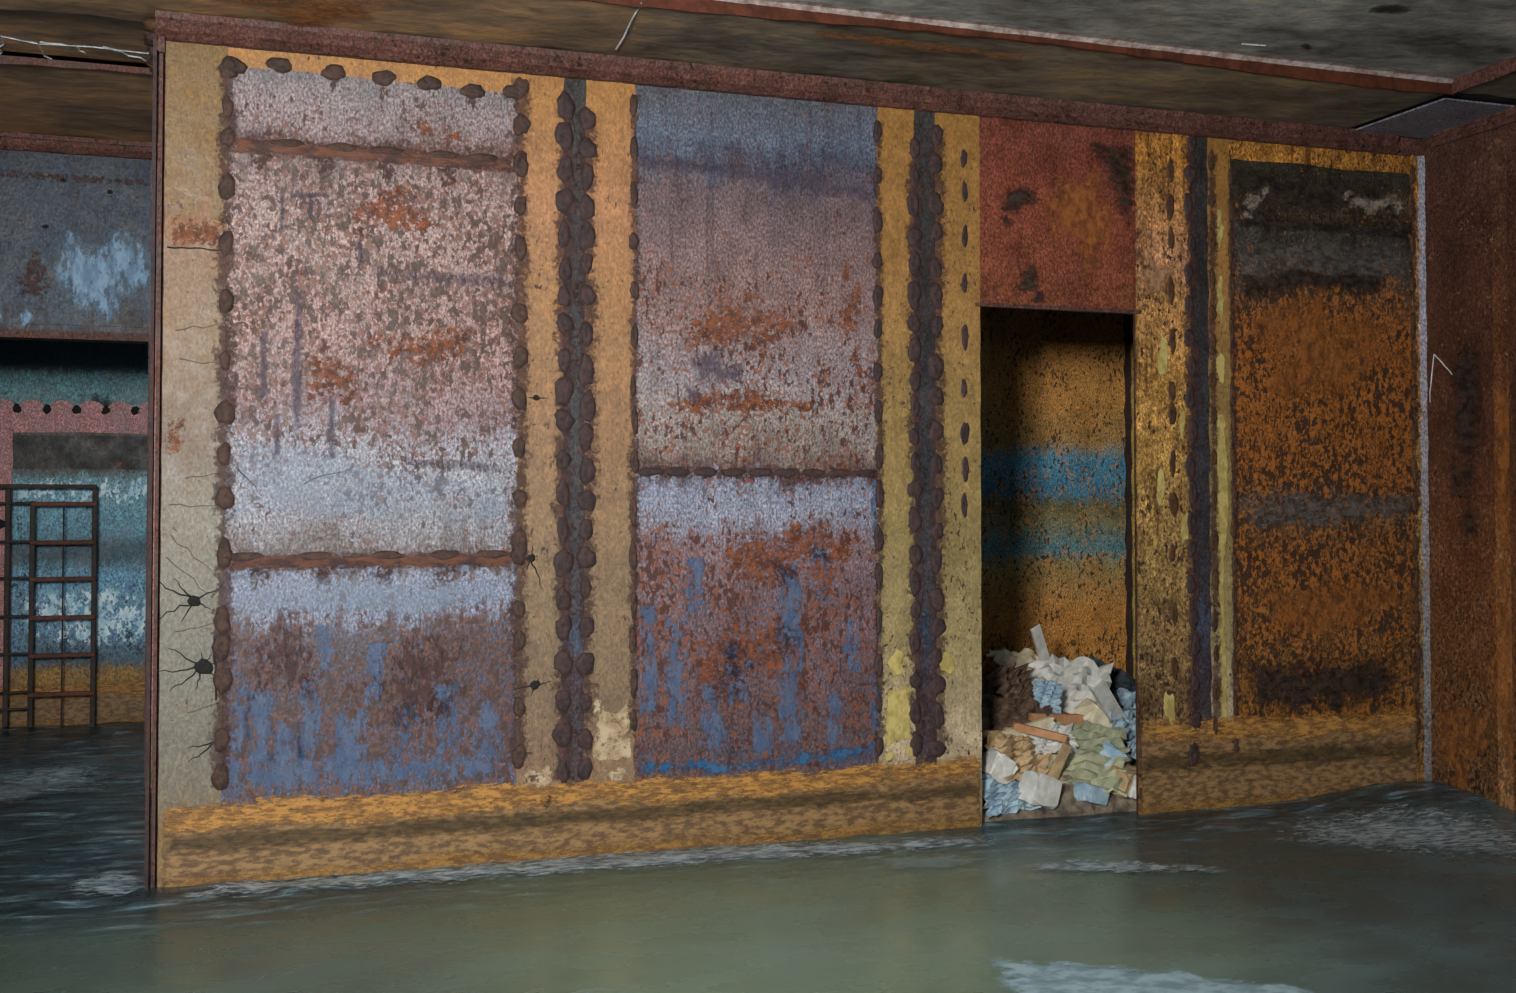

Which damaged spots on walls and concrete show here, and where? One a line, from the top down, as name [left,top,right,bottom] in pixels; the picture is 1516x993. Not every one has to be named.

crack [175,323,221,364]
crack [153,469,258,762]
crack [303,466,354,485]
corrosion [172,56,532,791]
corrosion [549,90,601,783]
corrosion [627,94,886,758]
corrosion [905,124,970,758]
leakage [1238,171,1408,299]
corrosion [1408,165,1421,737]
corrosion [1495,378,1510,551]